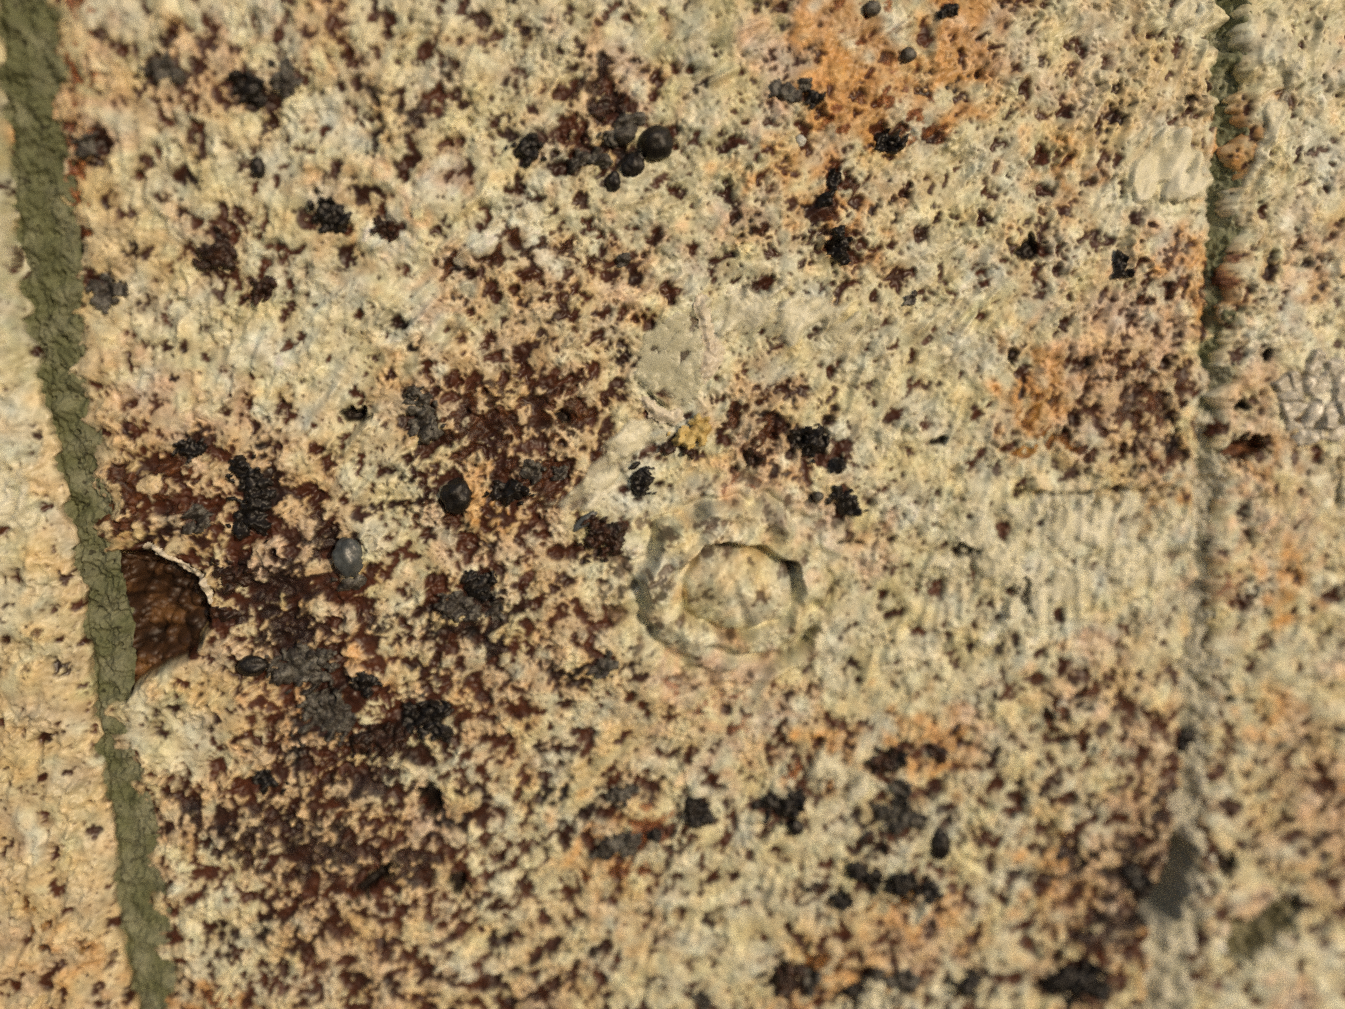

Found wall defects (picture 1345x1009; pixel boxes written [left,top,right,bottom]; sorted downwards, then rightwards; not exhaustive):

spalling [120,542,214,685]